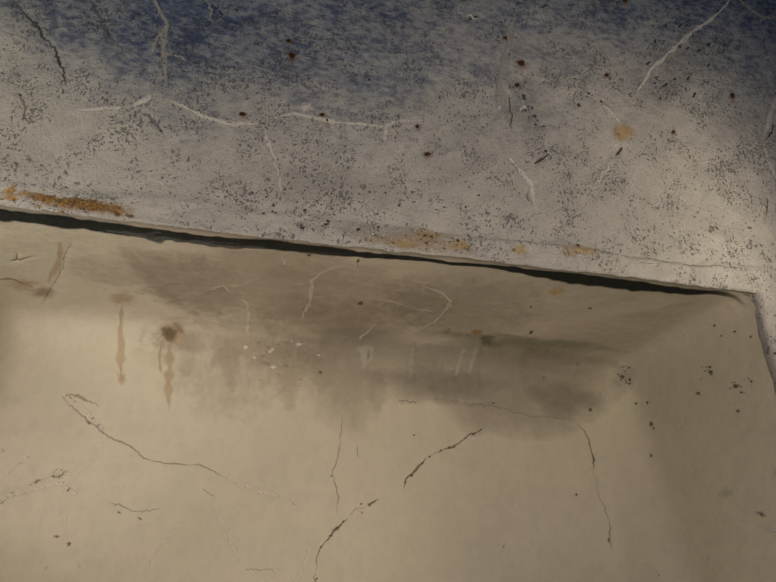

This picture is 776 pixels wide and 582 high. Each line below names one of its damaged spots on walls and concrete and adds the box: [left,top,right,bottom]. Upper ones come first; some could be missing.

crack [17,4,66,83]
crack [71,0,415,196]
crack [602,0,776,123]
corrosion [0,185,133,218]
crack [594,147,623,185]
crack [404,429,482,487]
crack [313,499,378,582]